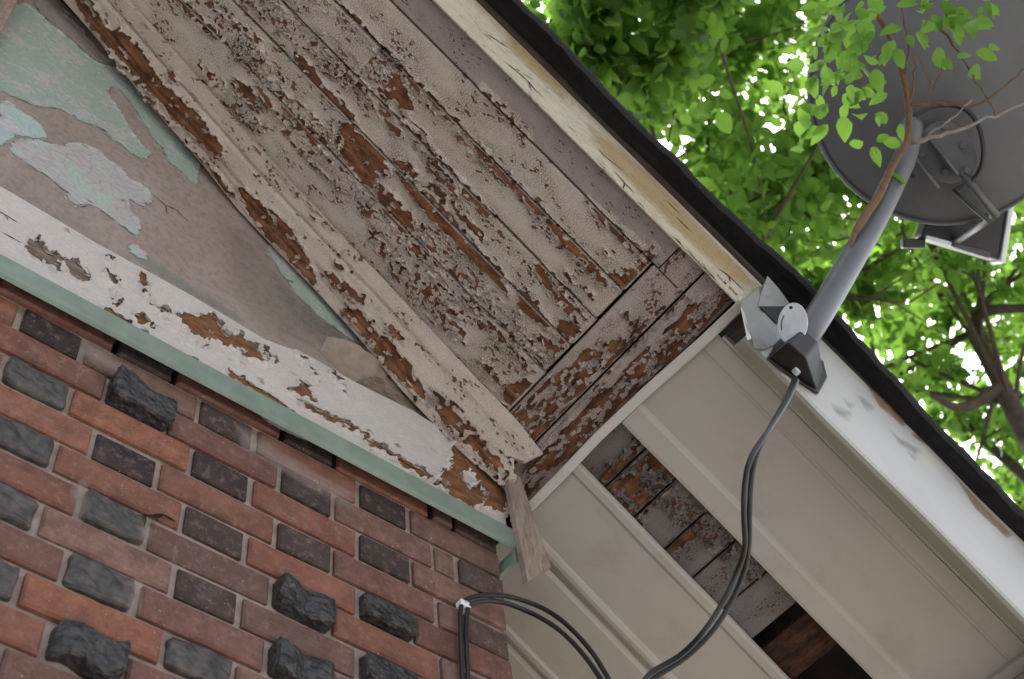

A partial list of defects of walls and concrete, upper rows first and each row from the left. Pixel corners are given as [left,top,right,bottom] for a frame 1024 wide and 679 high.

peeling [0,0,738,519]
peeling [595,435,766,583]